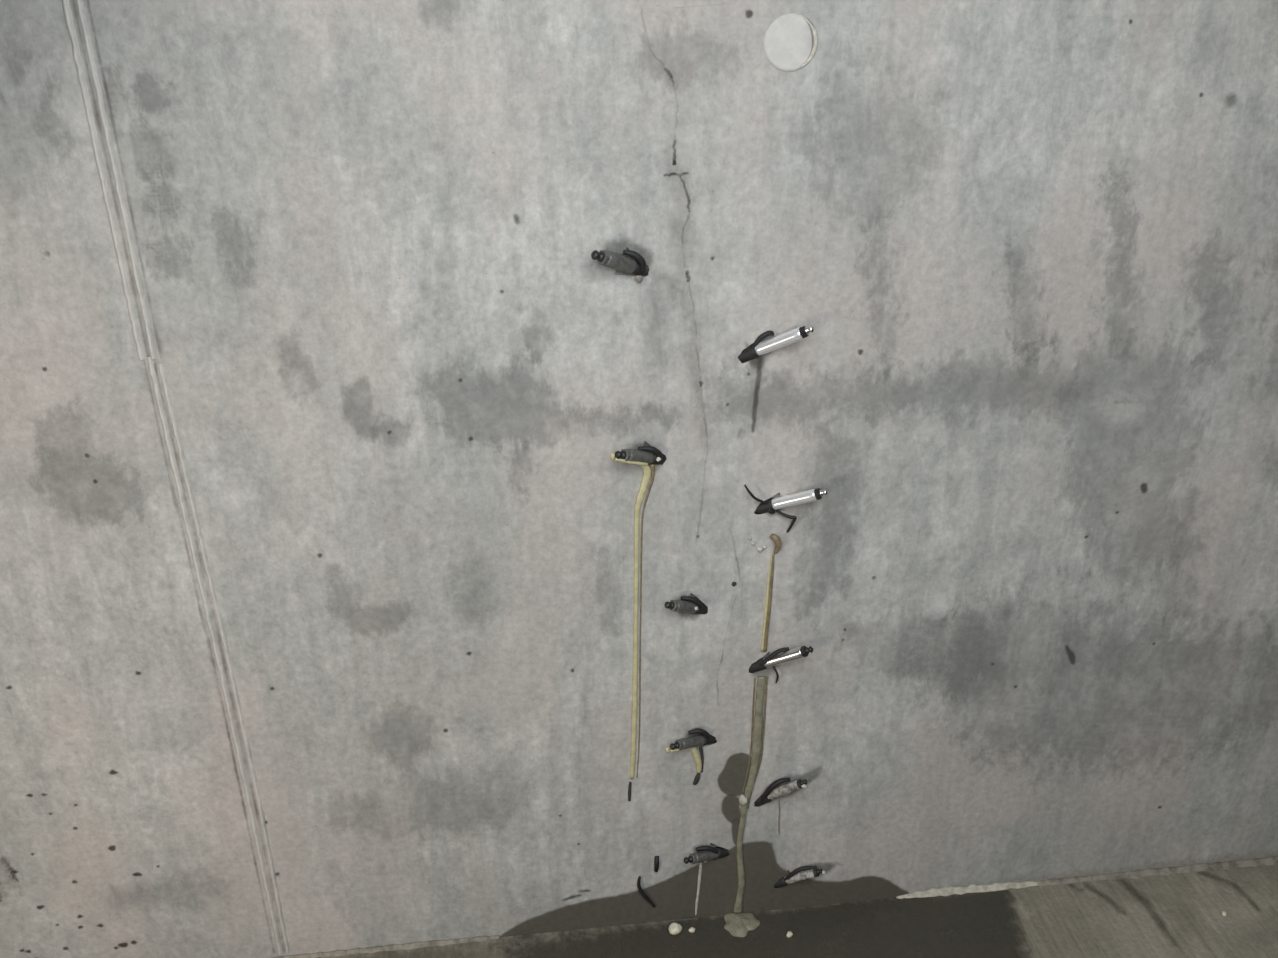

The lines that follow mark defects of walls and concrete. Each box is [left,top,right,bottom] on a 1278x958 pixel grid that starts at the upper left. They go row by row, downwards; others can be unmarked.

crack [664,153,690,211]
water stain [751,356,762,430]
water stain [500,676,1027,958]